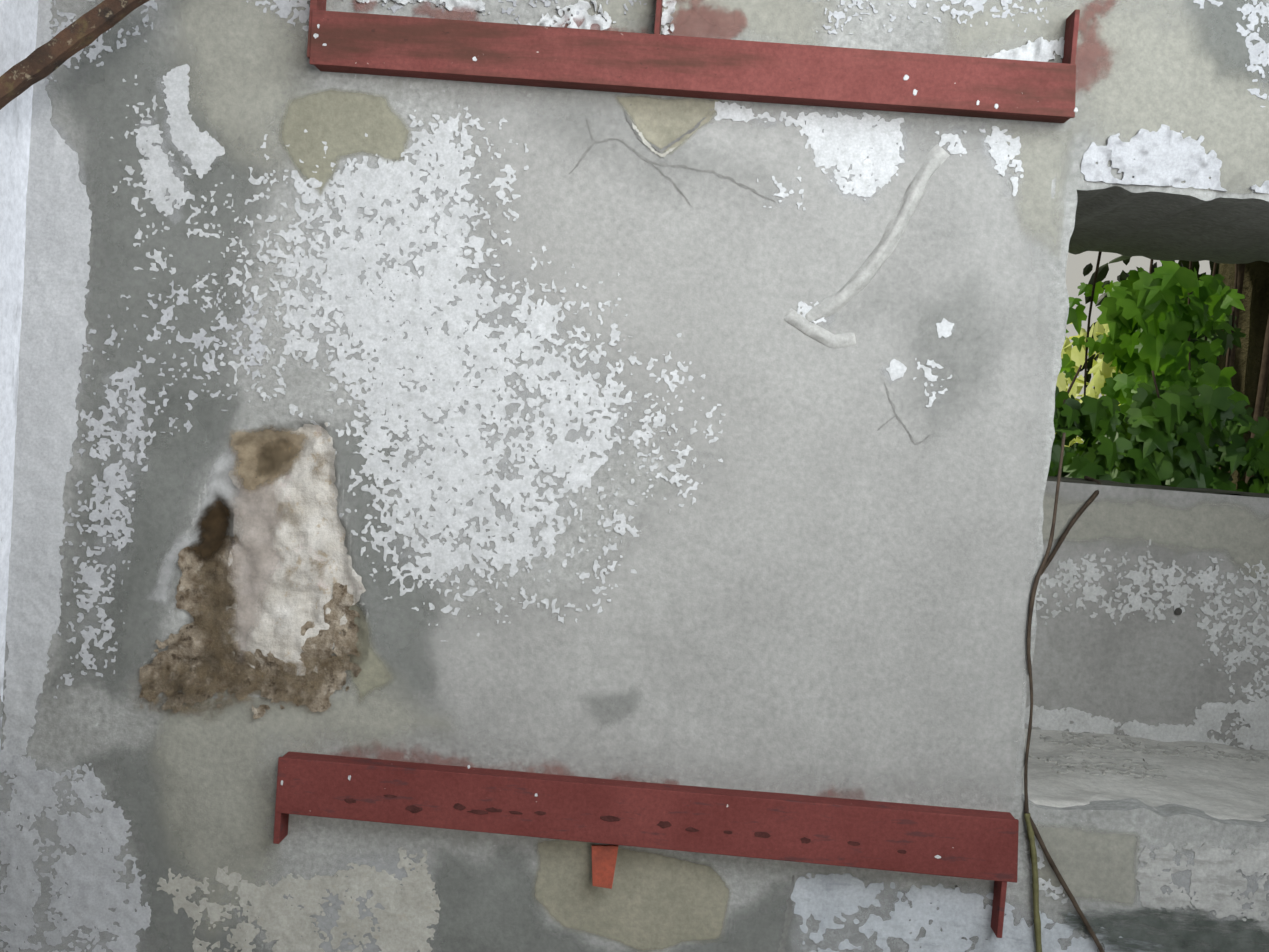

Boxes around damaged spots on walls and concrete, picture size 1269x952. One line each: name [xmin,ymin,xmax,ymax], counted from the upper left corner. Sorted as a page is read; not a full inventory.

peeling [35,0,77,50]
crack [569,119,775,205]
spalling [1080,124,1227,192]
spalling [1249,180,1269,194]
peeling [0,64,726,952]
peeling [1024,539,1269,750]
peeling [791,873,1159,952]